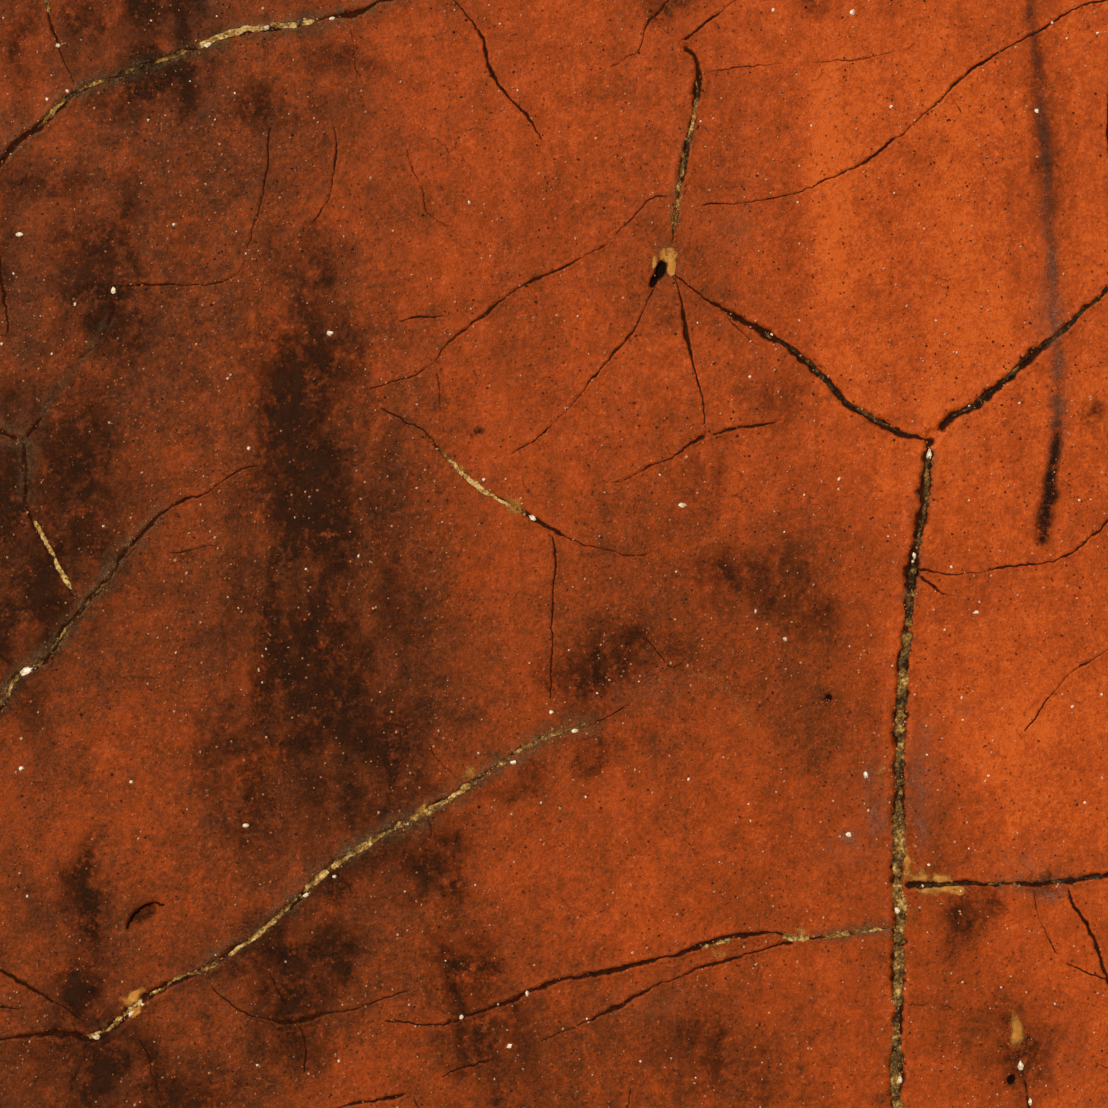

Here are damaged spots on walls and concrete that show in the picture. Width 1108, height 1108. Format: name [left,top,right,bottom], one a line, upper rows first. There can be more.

crack [0,0,392,166]
crack [247,128,271,245]
crack [313,134,338,221]
crack [1100,99,1108,142]
crack [369,0,1106,699]
leakage [1037,396,1061,543]
leakage [0,412,112,696]
leakage [251,299,410,817]
crack [0,275,1108,1108]
leakage [66,849,101,948]
leakage [56,961,101,1018]
leakage [232,927,355,1050]